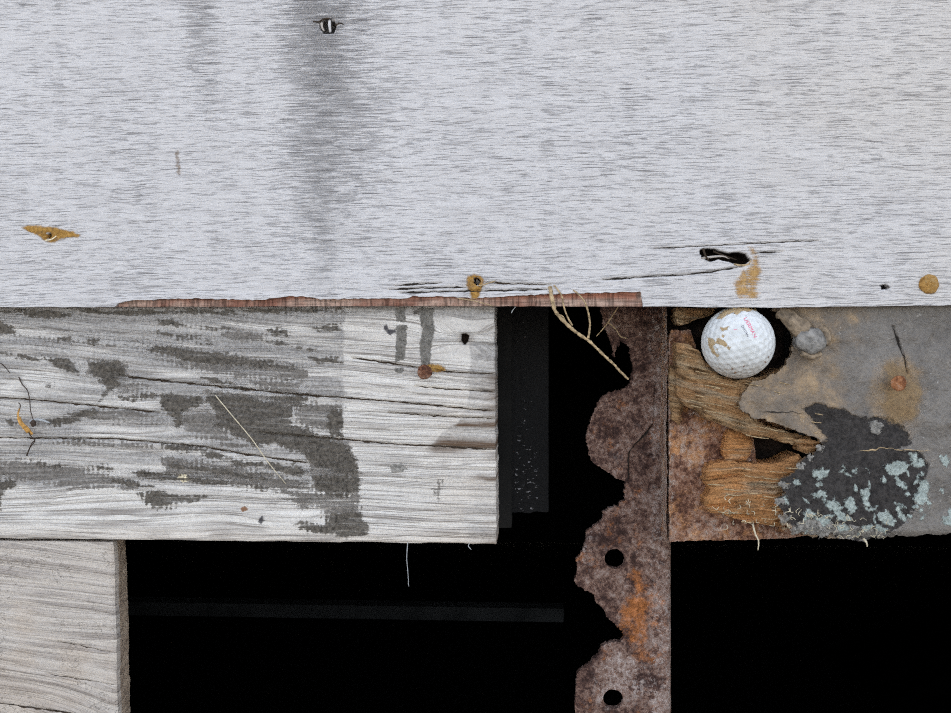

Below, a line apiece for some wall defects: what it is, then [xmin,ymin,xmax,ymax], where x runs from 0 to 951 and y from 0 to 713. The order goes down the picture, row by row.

corrosion [24,225,79,242]
crack [603,240,819,280]
corrosion [736,249,760,298]